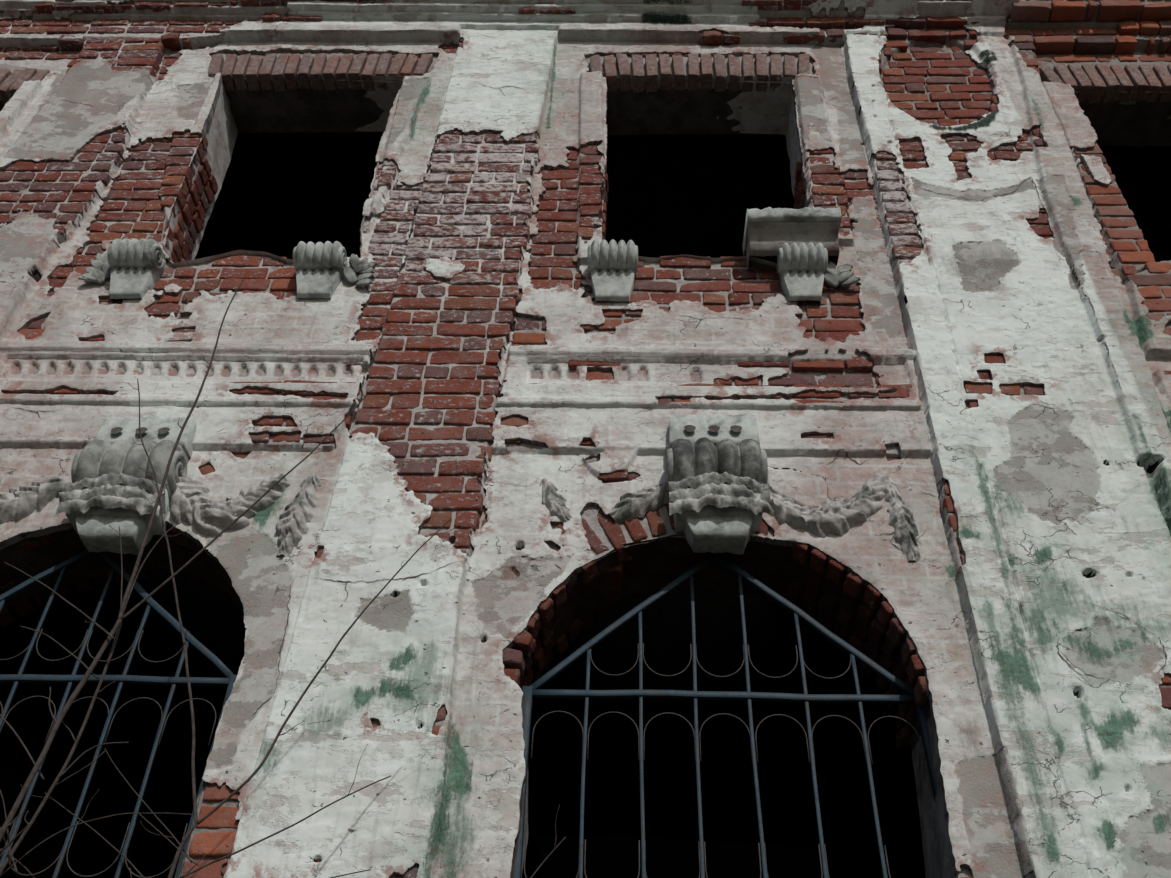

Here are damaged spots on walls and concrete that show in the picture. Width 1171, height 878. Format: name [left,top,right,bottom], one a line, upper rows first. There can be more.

flaking render [1003,0,1171,83]
flaking render [0,0,464,342]
flaking render [1069,140,1171,336]
flaking render [229,0,1101,570]
flaking render [1,385,118,395]
flaking render [198,462,215,475]
flaking render [355,590,414,633]
flaking render [179,526,293,878]
flaking render [431,704,448,735]
flaking render [1062,616,1171,710]
flaking render [389,863,420,878]